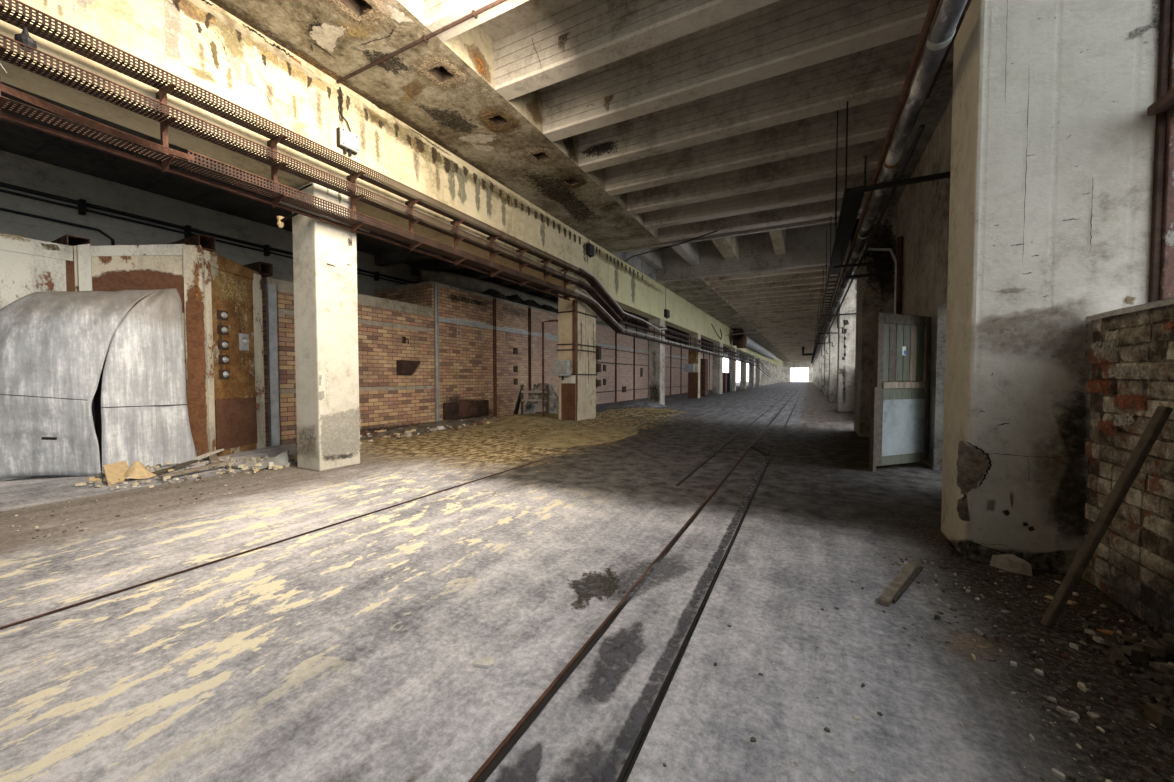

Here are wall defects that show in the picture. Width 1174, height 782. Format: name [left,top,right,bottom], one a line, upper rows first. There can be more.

peeling [164,0,184,63]
leakage [173,0,660,303]
rust [75,266,209,459]
leakage [978,308,1081,364]
spalling [956,441,992,521]